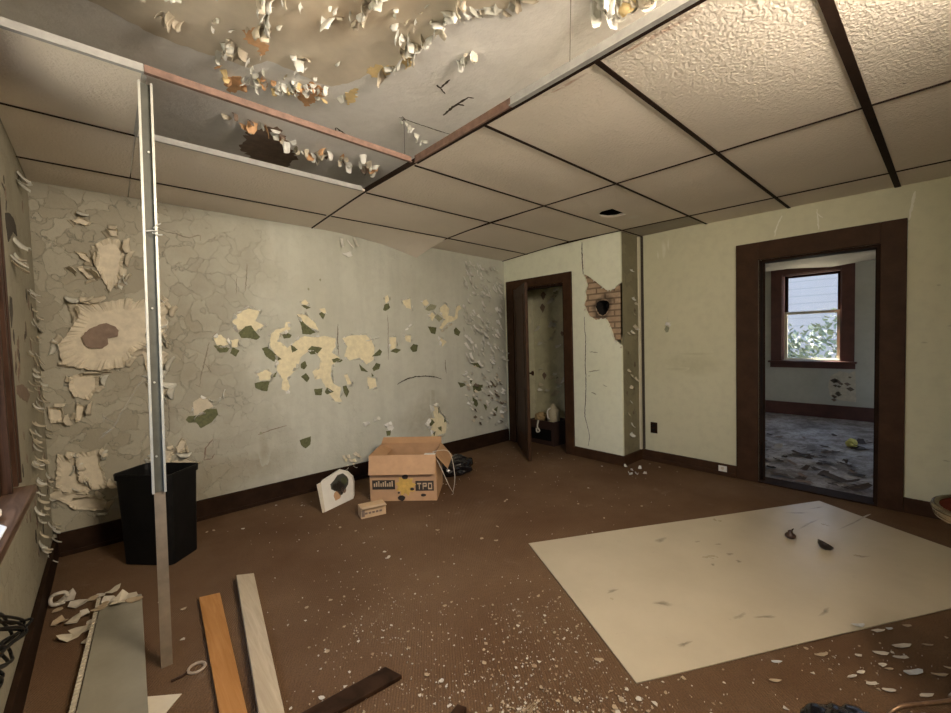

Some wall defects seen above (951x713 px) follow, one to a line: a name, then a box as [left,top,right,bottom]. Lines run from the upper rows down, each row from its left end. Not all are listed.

peeling [88,0,539,107]
peeling [590,0,657,30]
peeling [3,171,32,210]
peeling [5,213,31,274]
peeling [221,112,380,178]
peeling [9,225,148,563]
peeling [160,295,178,402]
peeling [212,288,418,404]
spalling [583,275,640,437]
peeling [165,438,201,464]